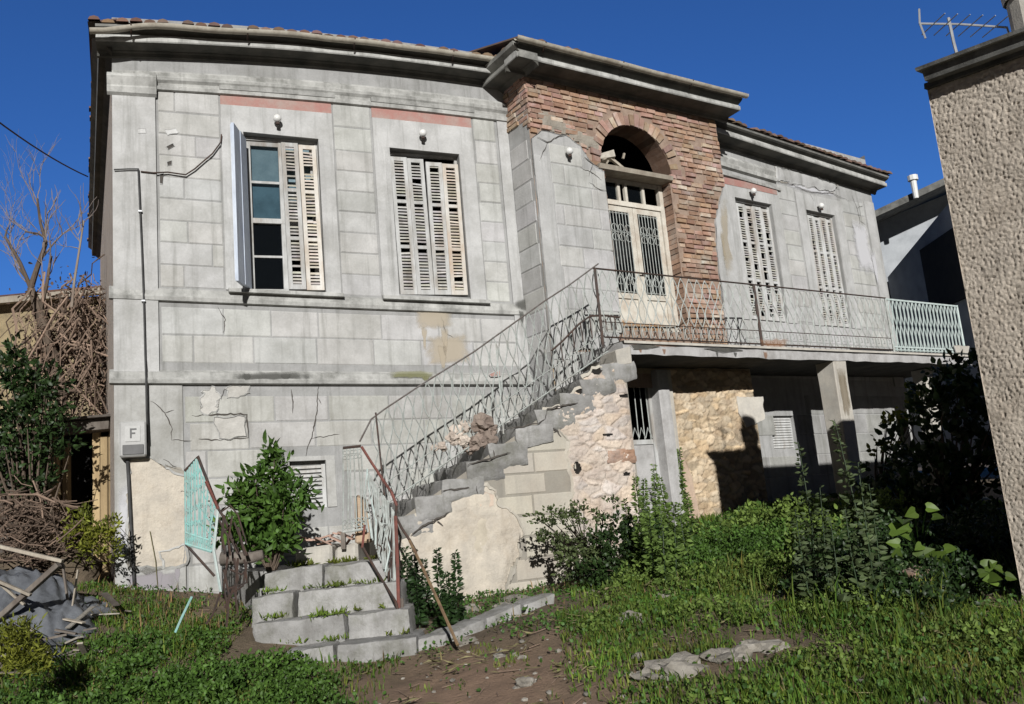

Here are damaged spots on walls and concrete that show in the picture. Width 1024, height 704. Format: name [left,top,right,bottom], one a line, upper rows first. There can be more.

water stain [394,312,468,380]
crack [151,390,249,467]
flaking render [199,385,250,440]
crack [291,387,339,454]
flaking render [736,396,765,428]
flaking render [125,455,191,575]
flaking render [680,451,700,519]